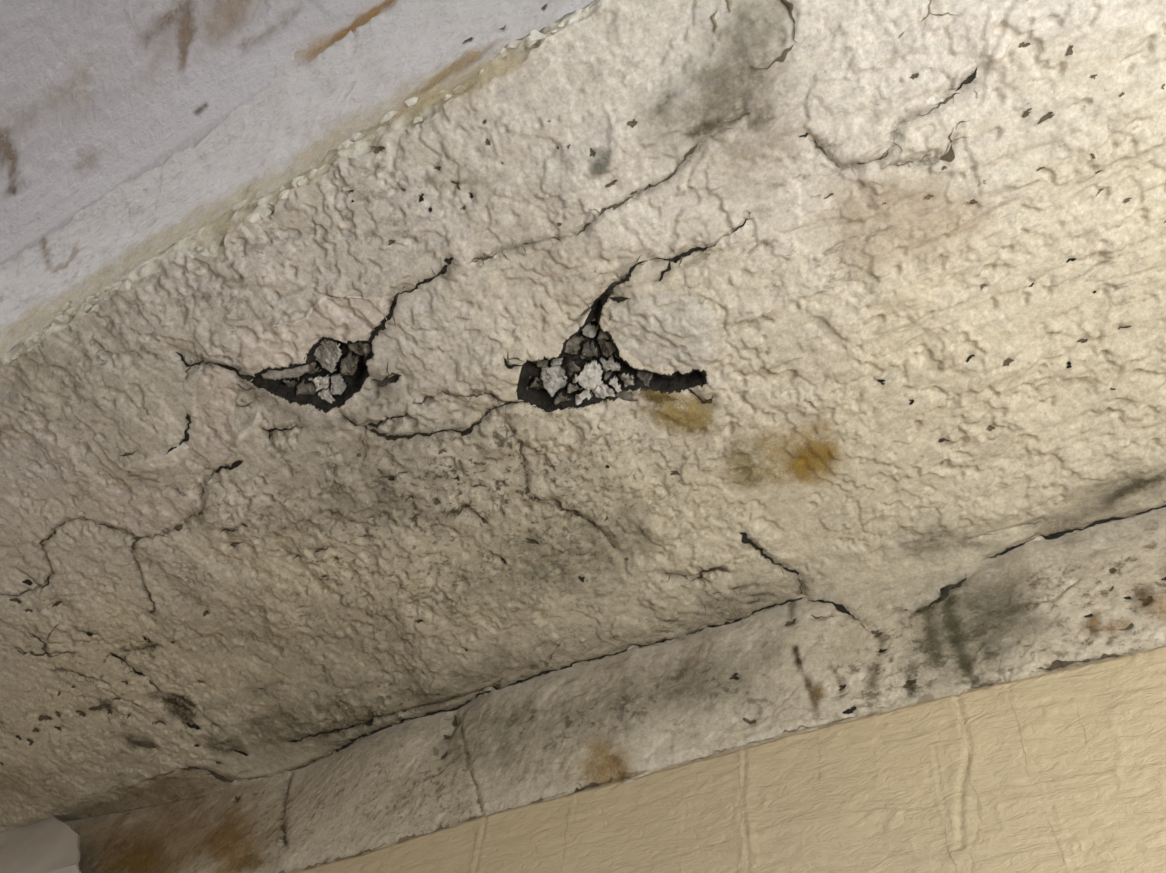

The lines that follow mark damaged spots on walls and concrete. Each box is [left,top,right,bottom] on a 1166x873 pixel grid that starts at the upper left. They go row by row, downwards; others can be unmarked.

corrosion [306,0,395,58]
spalling [0,0,611,368]
leakage [694,122,719,136]
crack [810,69,978,186]
spalling [1022,108,1054,124]
crack [335,109,753,549]
spalling [514,288,709,414]
spalling [84,336,374,534]
corrosion [732,427,834,486]
crack [893,500,1166,613]
crack [131,532,870,853]
leakage [882,587,1011,696]